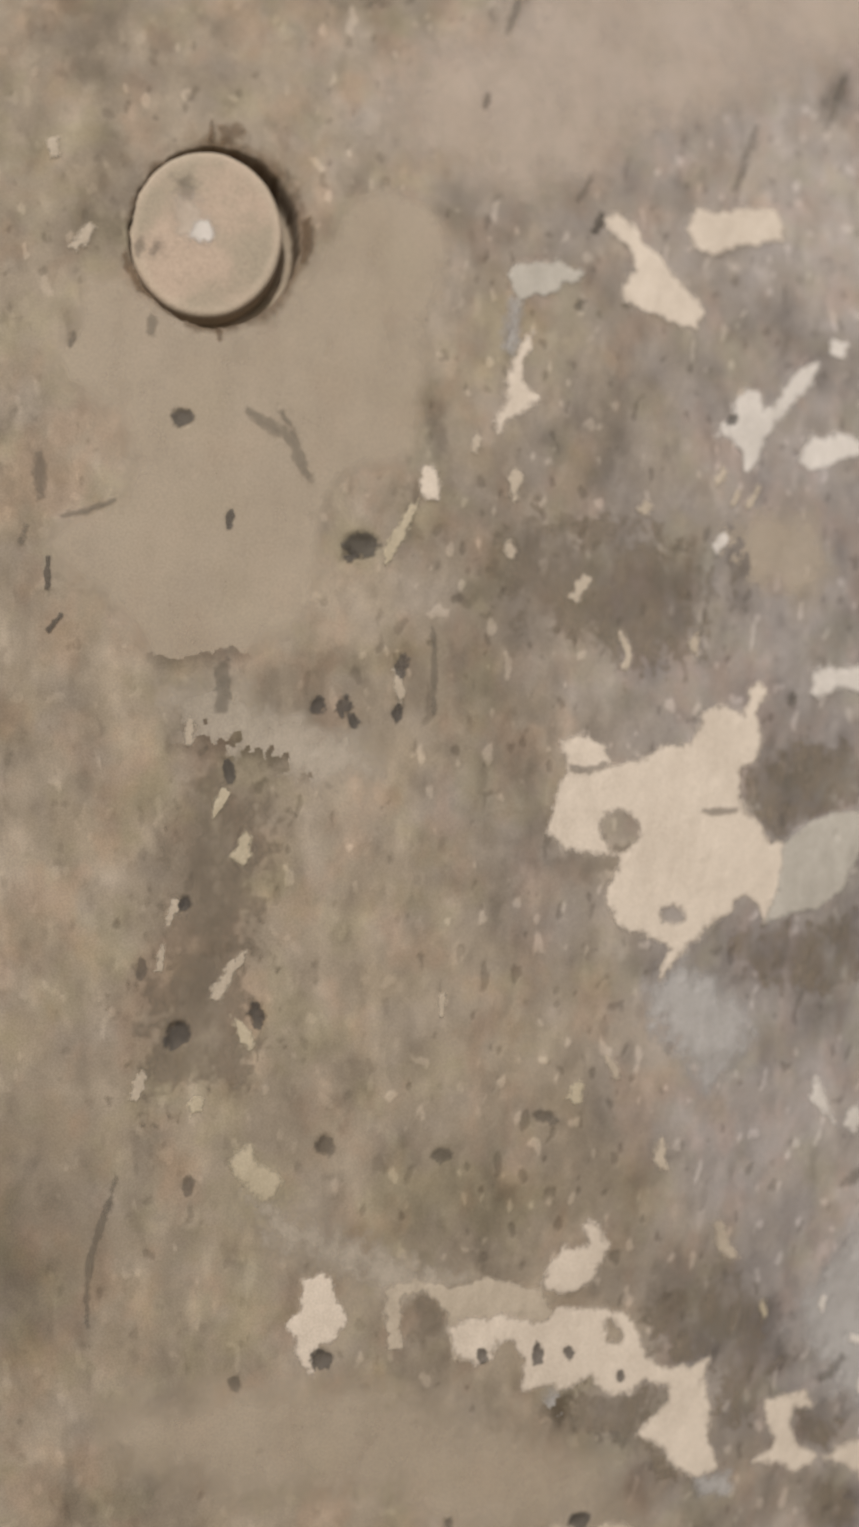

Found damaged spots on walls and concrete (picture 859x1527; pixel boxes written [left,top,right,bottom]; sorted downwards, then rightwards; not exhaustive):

peeling [603,213,705,330]
peeling [686,207,784,255]
peeling [714,338,859,510]
peeling [546,681,859,978]
peeling [286,1273,347,1374]
peeling [385,1219,717,1477]